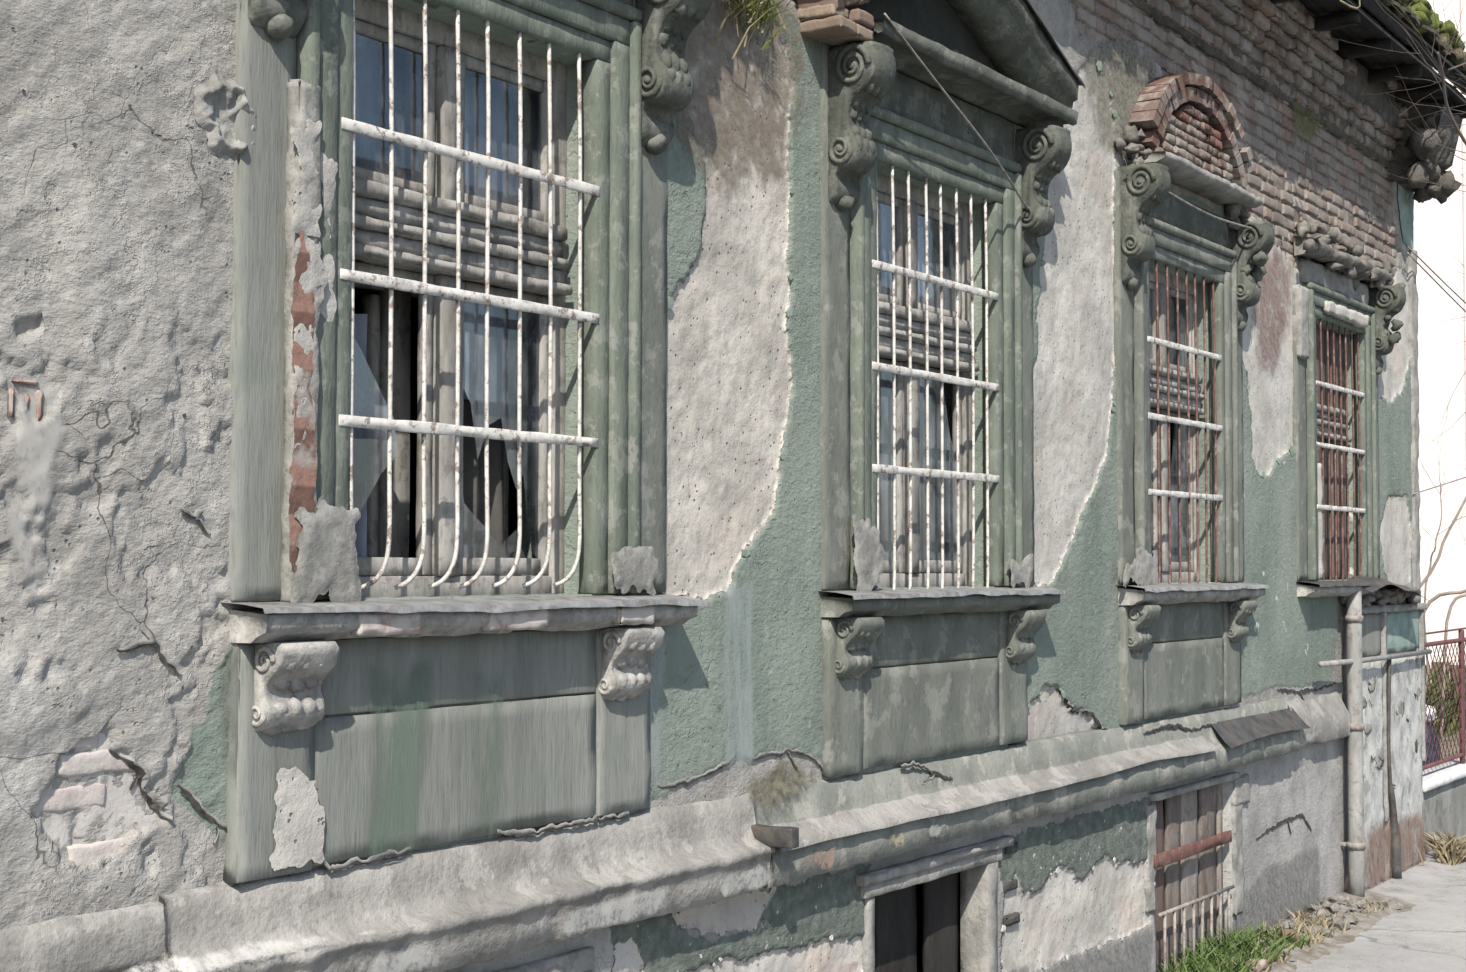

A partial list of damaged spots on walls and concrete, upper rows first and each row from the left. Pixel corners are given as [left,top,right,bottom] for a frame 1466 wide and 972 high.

flaking render [792,0,875,47]
flaking render [1068,0,1414,478]
flaking render [288,119,421,636]
flaking render [611,0,795,625]
flaking render [1008,60,1117,588]
crack [181,507,210,535]
crack [117,621,181,676]
flaking render [32,733,160,866]
crack [108,745,227,844]
flaking render [269,766,325,871]
flaking render [688,935,863,972]
flaking render [1000,802,1157,972]